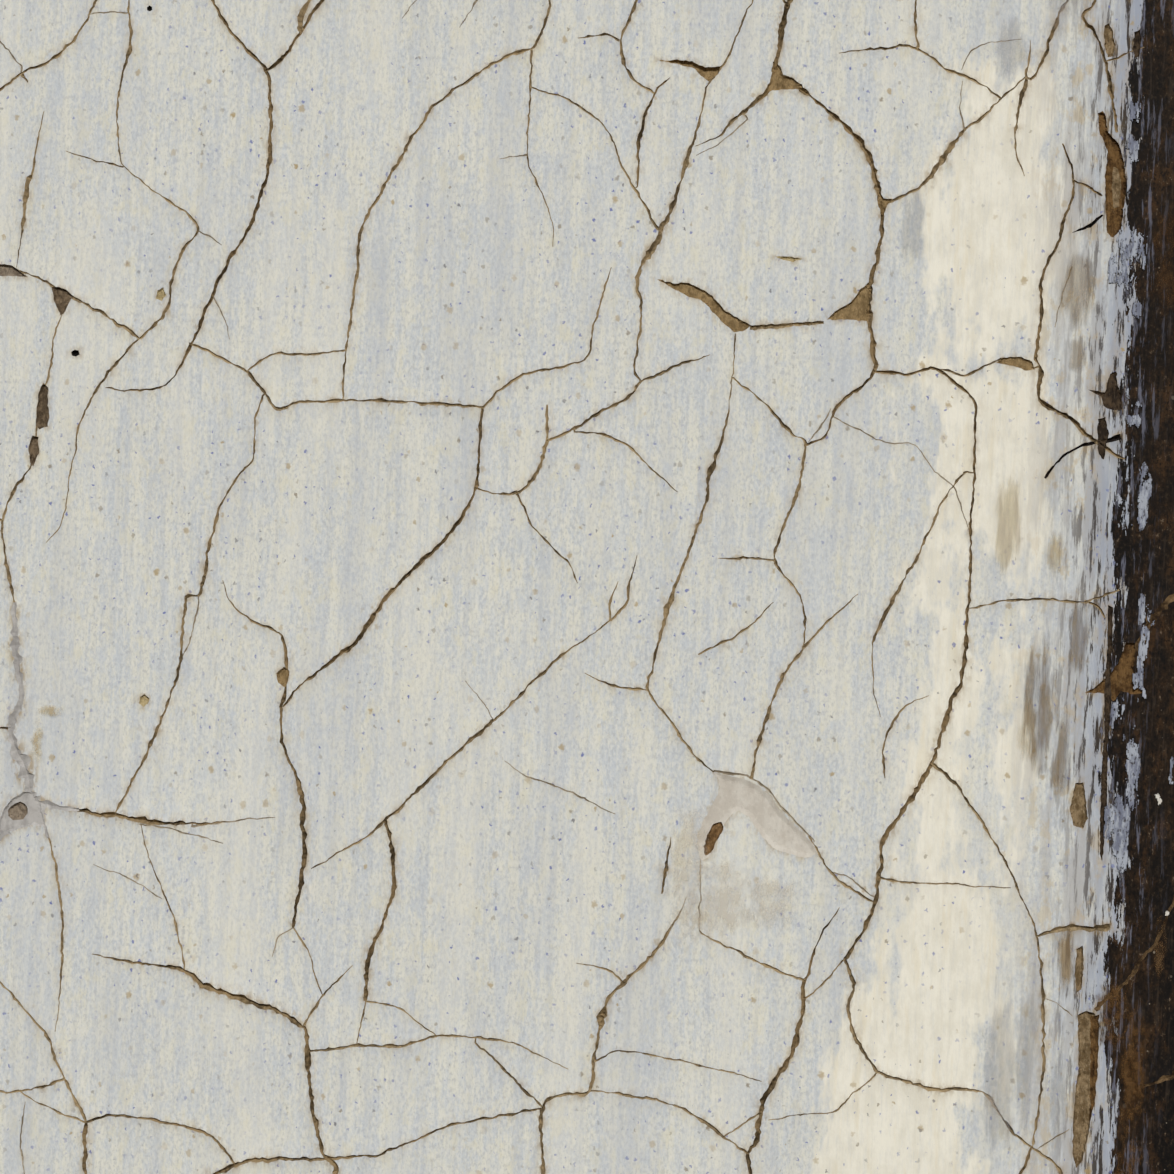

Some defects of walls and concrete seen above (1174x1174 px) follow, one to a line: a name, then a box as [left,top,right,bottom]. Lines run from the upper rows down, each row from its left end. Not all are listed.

spalling [658,279,871,332]
crack [771,0,793,72]
crack [799,88,882,195]
crack [840,0,1069,203]
crack [1034,143,1125,479]
peeling [1098,101,1148,319]
spalling [28,383,49,466]
peeling [1090,372,1142,459]
crack [0,0,716,1174]
crack [538,206,1120,1174]
peeling [1070,594,1155,873]
peeling [1072,1011,1100,1168]